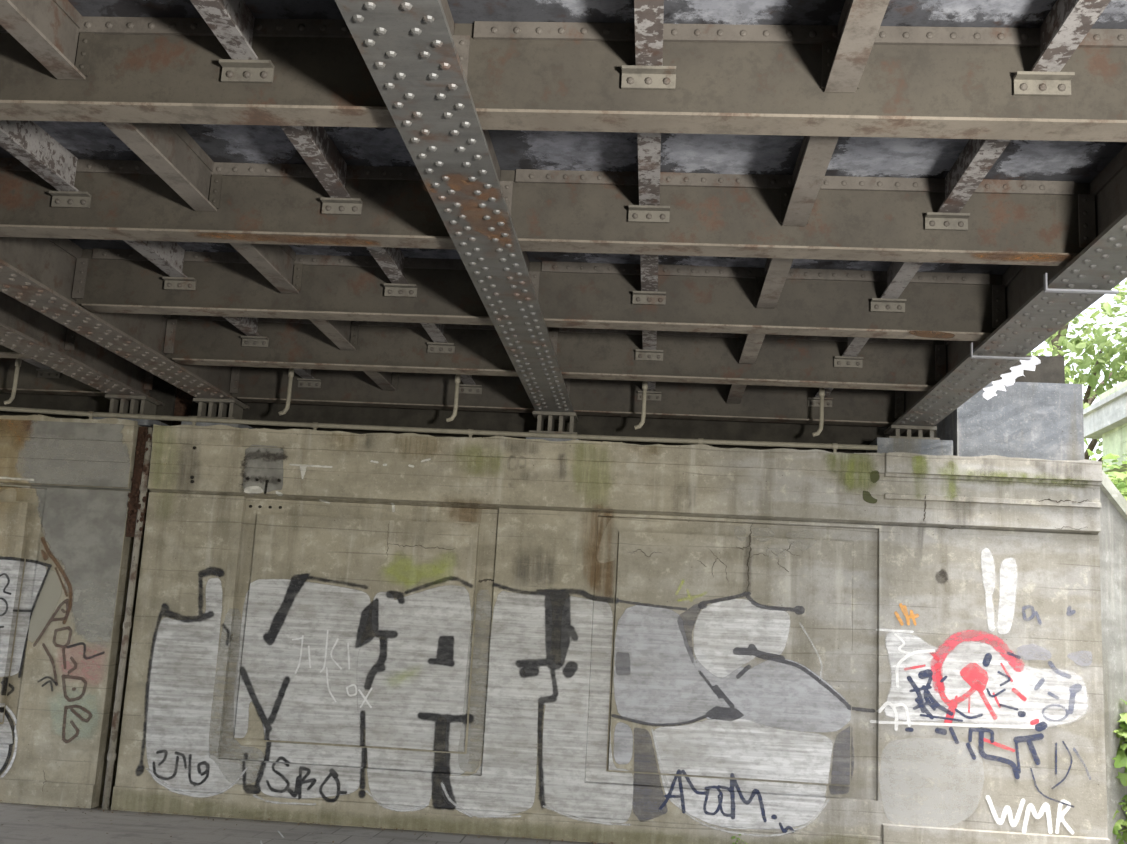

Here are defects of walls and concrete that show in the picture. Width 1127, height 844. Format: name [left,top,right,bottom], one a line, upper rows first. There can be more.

rust [126,427,153,537]
crack [697,523,799,592]